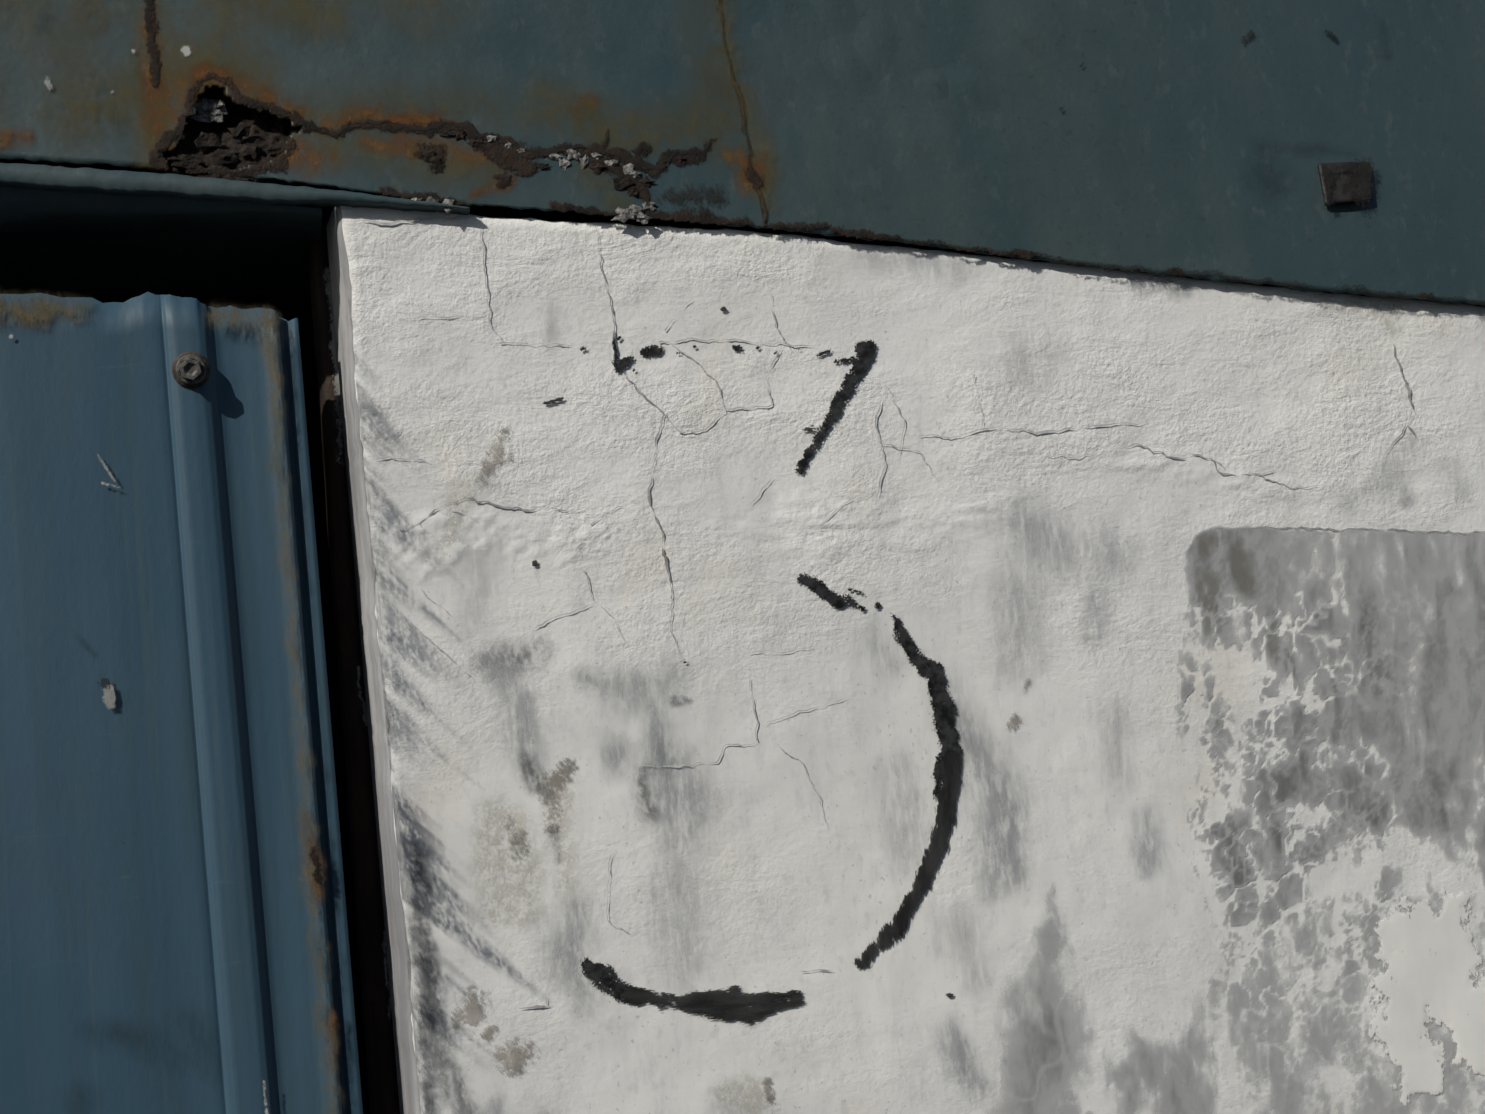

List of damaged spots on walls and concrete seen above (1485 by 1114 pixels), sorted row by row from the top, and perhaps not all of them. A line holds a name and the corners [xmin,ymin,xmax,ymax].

corrosion [143,0,163,134]
corrosion [325,109,489,164]
corrosion [377,179,514,206]
crack [357,211,576,347]
corrosion [549,0,1484,304]
crack [392,226,819,649]
water stain [479,648,578,833]
water stain [634,679,699,817]
peeling [1175,526,1485,1114]
water stain [391,785,434,1114]
water stain [992,889,1092,1114]
water stain [1106,1010,1216,1114]